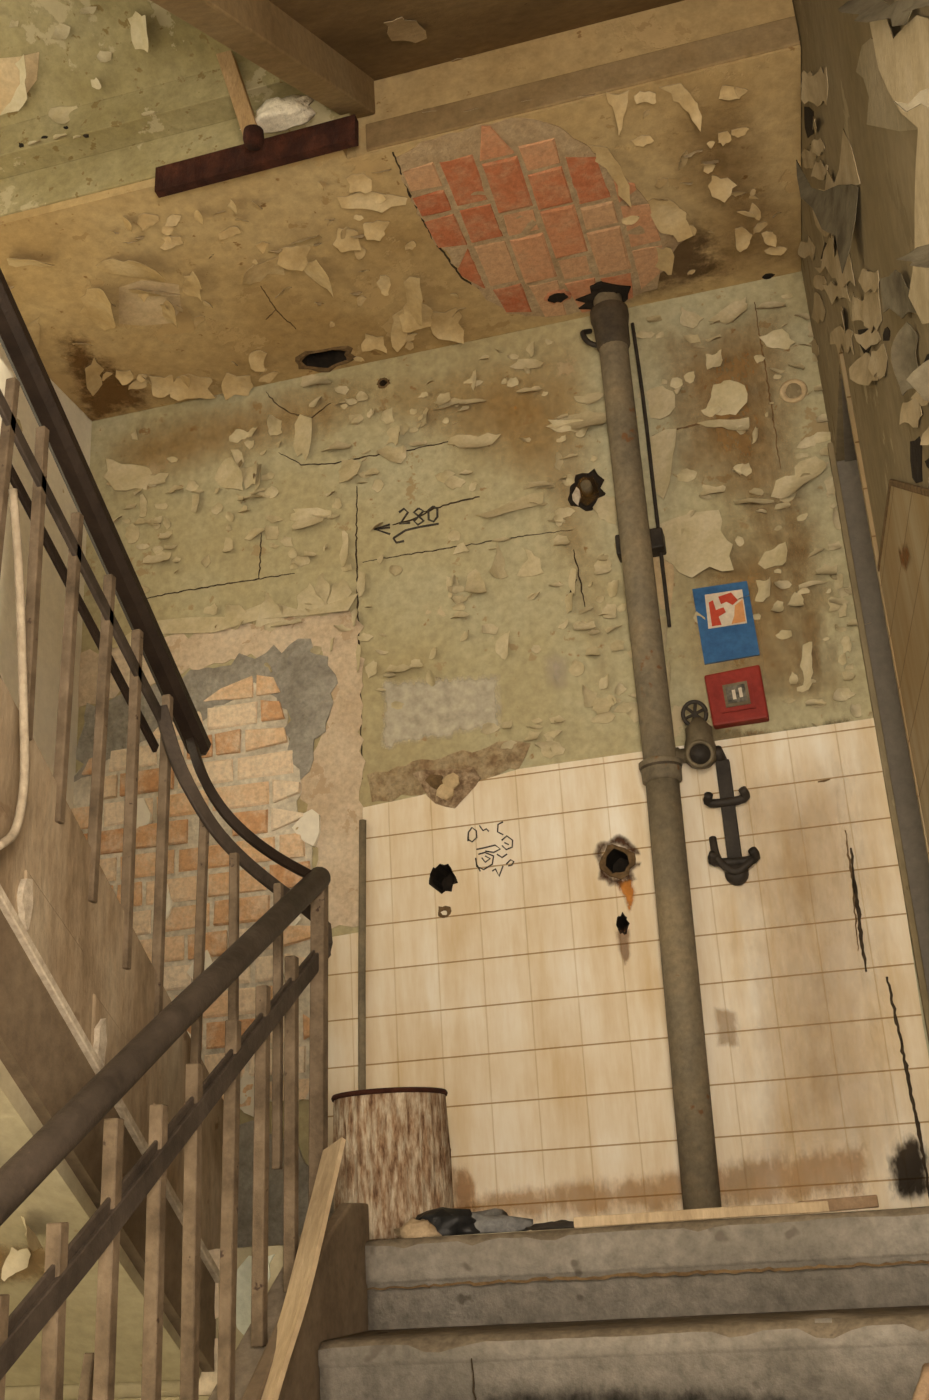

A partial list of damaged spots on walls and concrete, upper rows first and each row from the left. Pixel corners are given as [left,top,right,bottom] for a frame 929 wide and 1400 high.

peeling [19,106,89,148]
peeling [7,258,54,267]
peeling [27,318,40,351]
flaking render [71,0,929,1002]
flaking render [187,903,311,1074]
crack [844,830,929,1197]
flaking render [222,983,310,1117]
leakage [891,1139,927,1197]
peeling [1,1216,43,1281]
leakage [561,1392,637,1400]